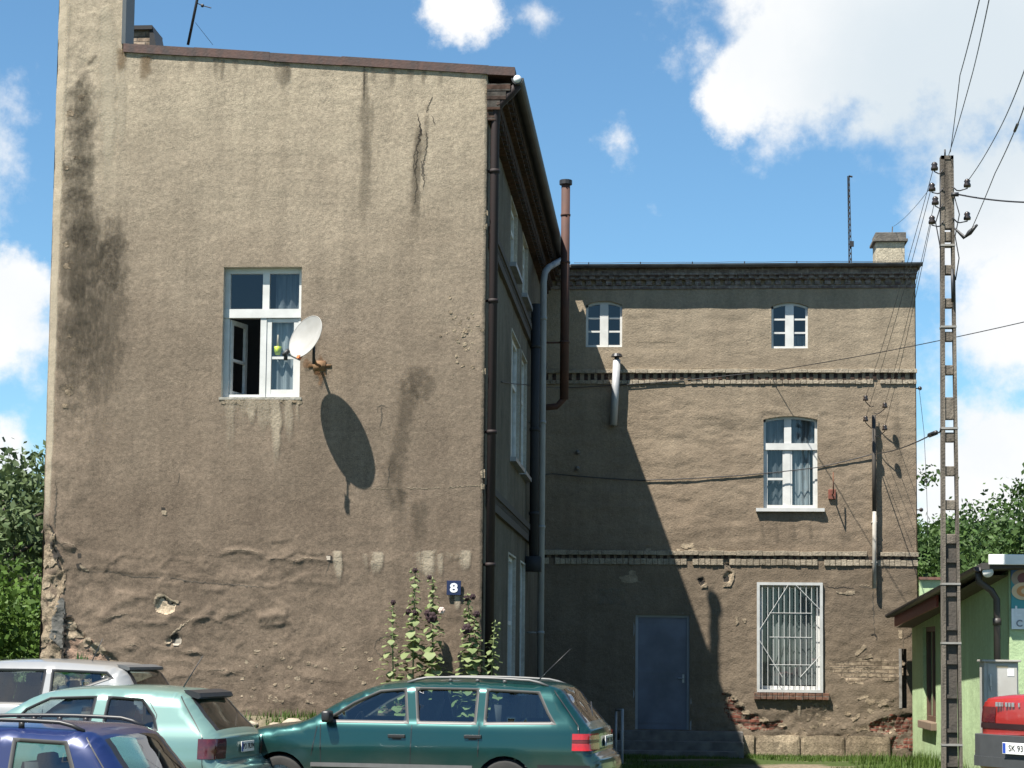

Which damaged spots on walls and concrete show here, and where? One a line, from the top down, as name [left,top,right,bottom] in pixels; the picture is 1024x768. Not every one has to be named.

crack [413,97,435,204]
flaking render [723,564,735,586]
flaking render [40,526,121,662]
flaking render [153,593,181,615]
flaking render [165,618,193,646]
flaking render [52,672,108,691]
peeling [722,644,913,750]